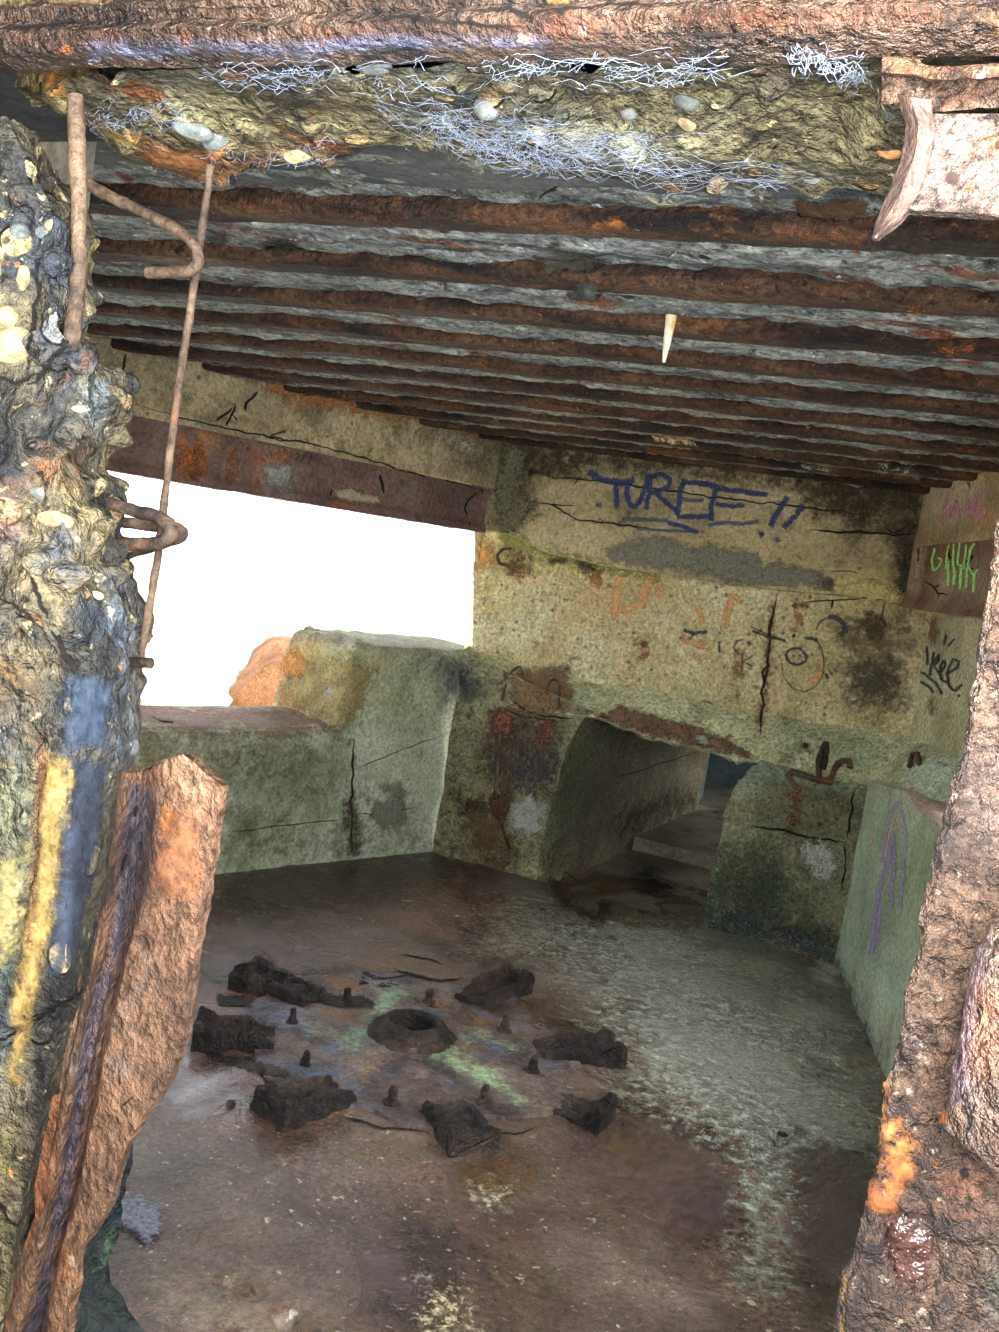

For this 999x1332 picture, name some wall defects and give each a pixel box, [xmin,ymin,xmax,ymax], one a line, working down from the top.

corrosion [45,71,65,96]
corrosion [137,148,224,179]
corrosion [482,213,629,233]
corrosion [174,439,209,481]
crack [524,469,947,598]
crack [750,571,885,738]
water stain [864,613,885,642]
water stain [851,658,898,704]
crack [226,734,445,847]
corrosion [158,807,199,896]
corrosion [0,759,75,1082]
corrosion [865,1082,913,1214]